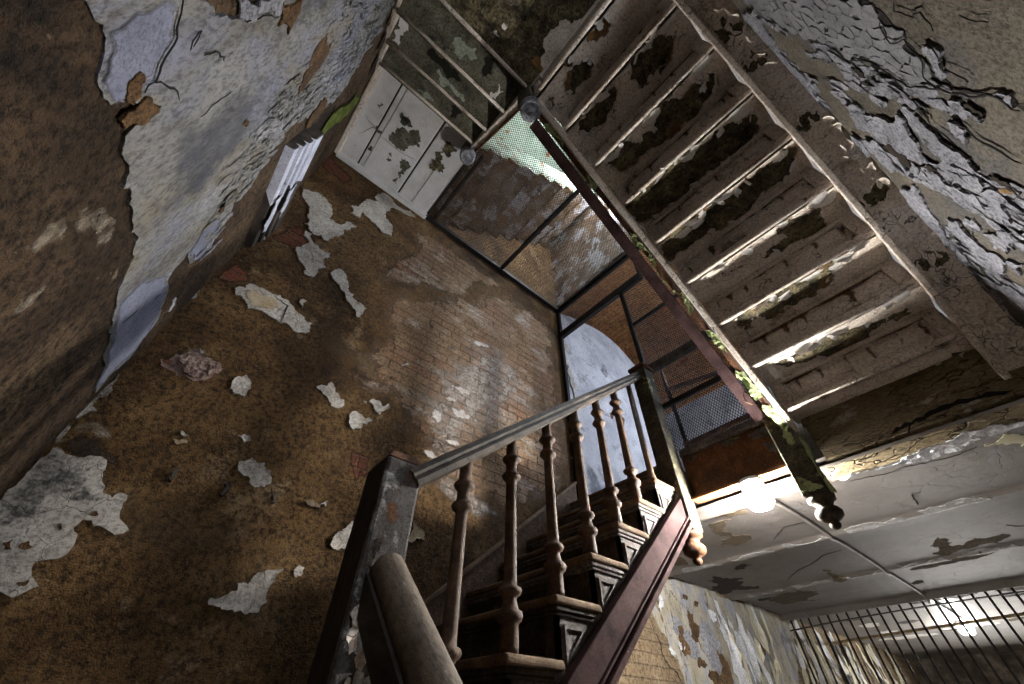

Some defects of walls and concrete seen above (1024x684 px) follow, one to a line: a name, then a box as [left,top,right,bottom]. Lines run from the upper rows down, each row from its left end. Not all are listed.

crack [145,0,225,100]
peeling [578,87,617,138]
peeling [630,34,674,88]
peeling [606,73,718,171]
crack [684,0,1024,217]
peeling [714,9,1024,336]
peeling [0,0,421,598]
crack [902,223,1024,362]
peeling [735,370,795,445]
peeling [796,421,1024,493]
peeling [208,564,304,615]
peeling [651,510,1024,684]